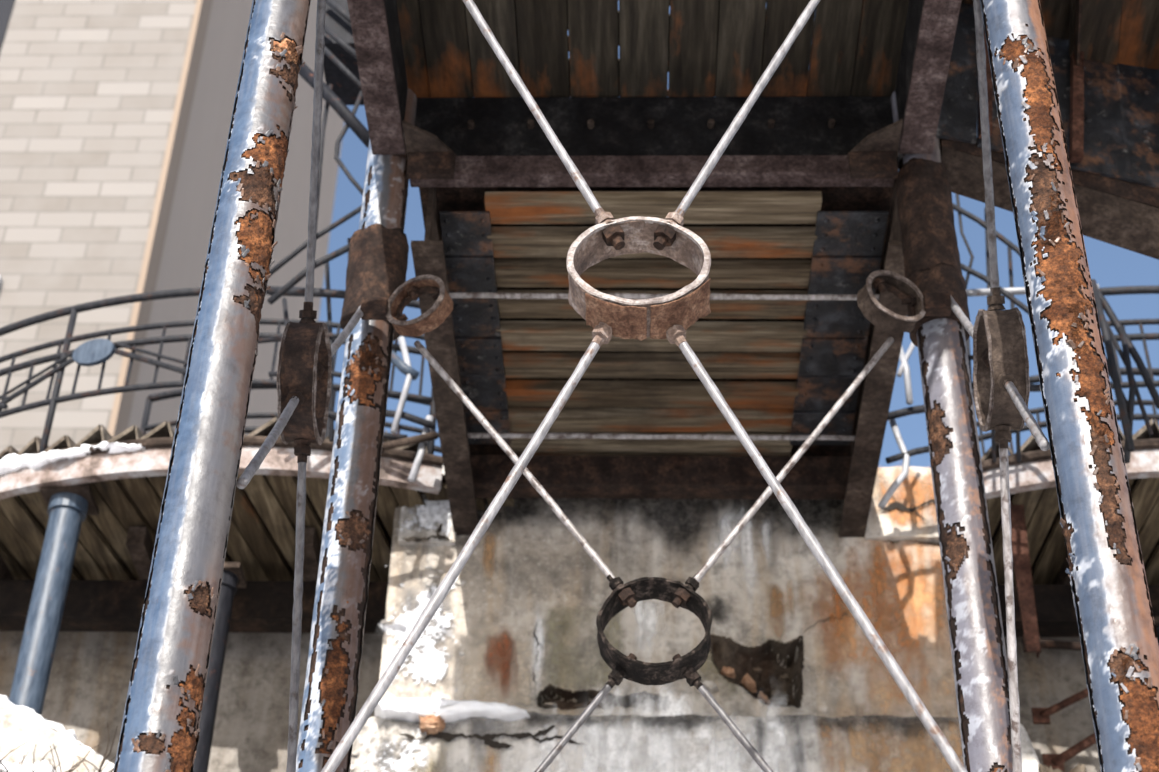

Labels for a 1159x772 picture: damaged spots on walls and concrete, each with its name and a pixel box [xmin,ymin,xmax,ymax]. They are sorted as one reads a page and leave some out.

water stain [721,516,768,575]
corrosion [488,632,512,686]
spalling [537,684,667,710]
spalling [703,634,805,708]
corrosion [820,543,963,772]
crack [396,725,584,761]